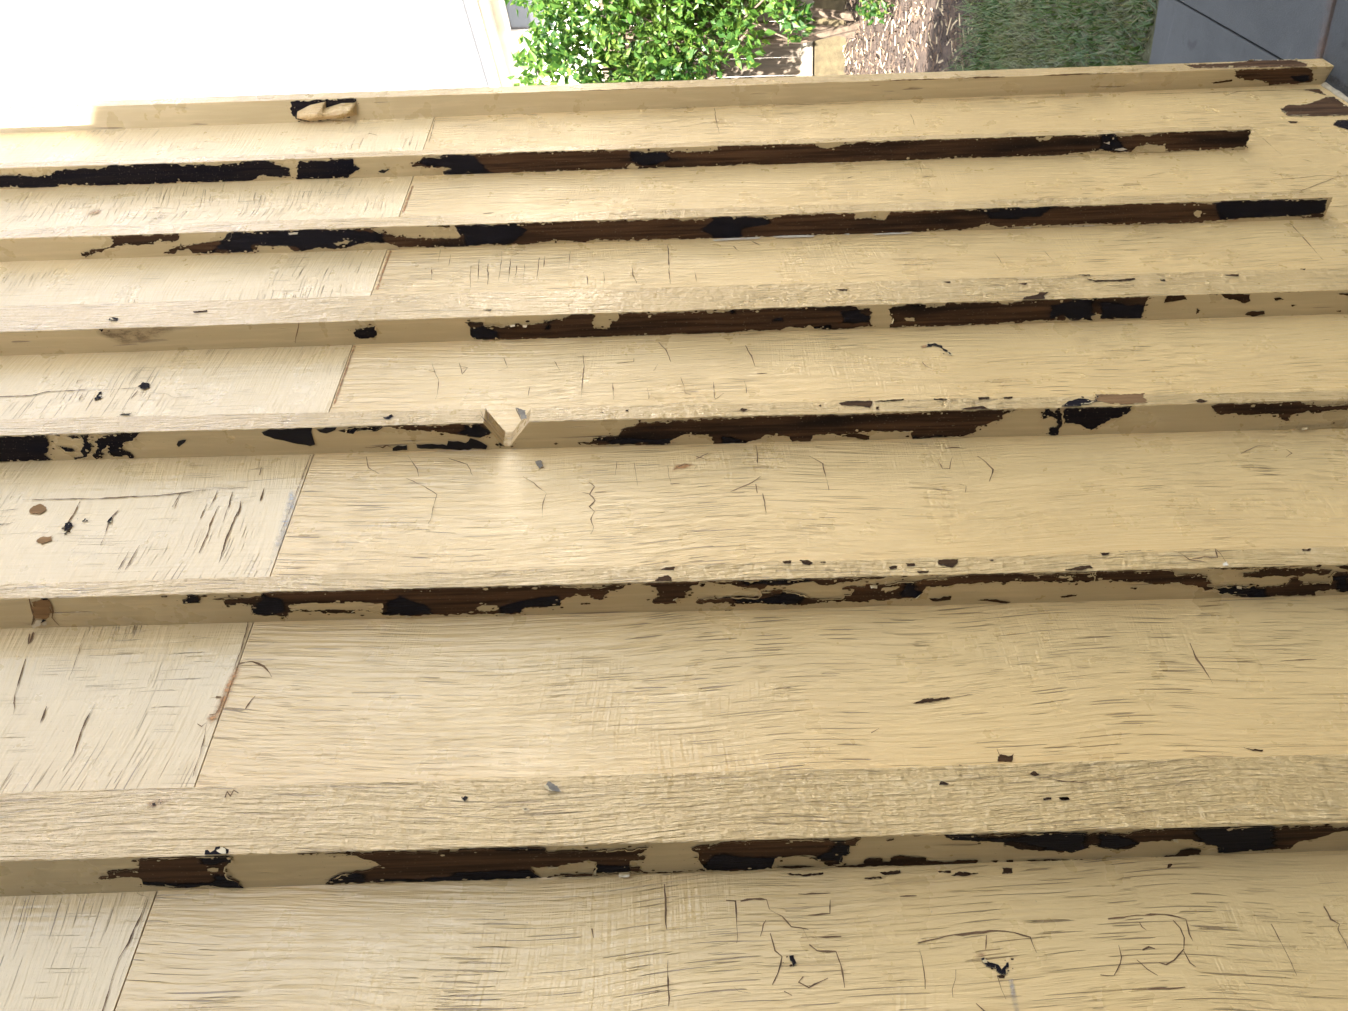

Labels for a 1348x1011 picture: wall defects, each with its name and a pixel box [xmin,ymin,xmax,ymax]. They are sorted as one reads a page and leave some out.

peeling [0,158,360,188]
peeling [411,129,1251,175]
peeling [80,198,1332,258]
peeling [465,279,1200,355]
peeling [161,548,1348,619]
peeling [297,824,1348,885]
crack [661,884,669,929]
crack [664,964,672,1006]
crack [726,893,845,996]
crack [918,930,1037,1011]
crack [1100,913,1196,990]
crack [1324,906,1348,948]